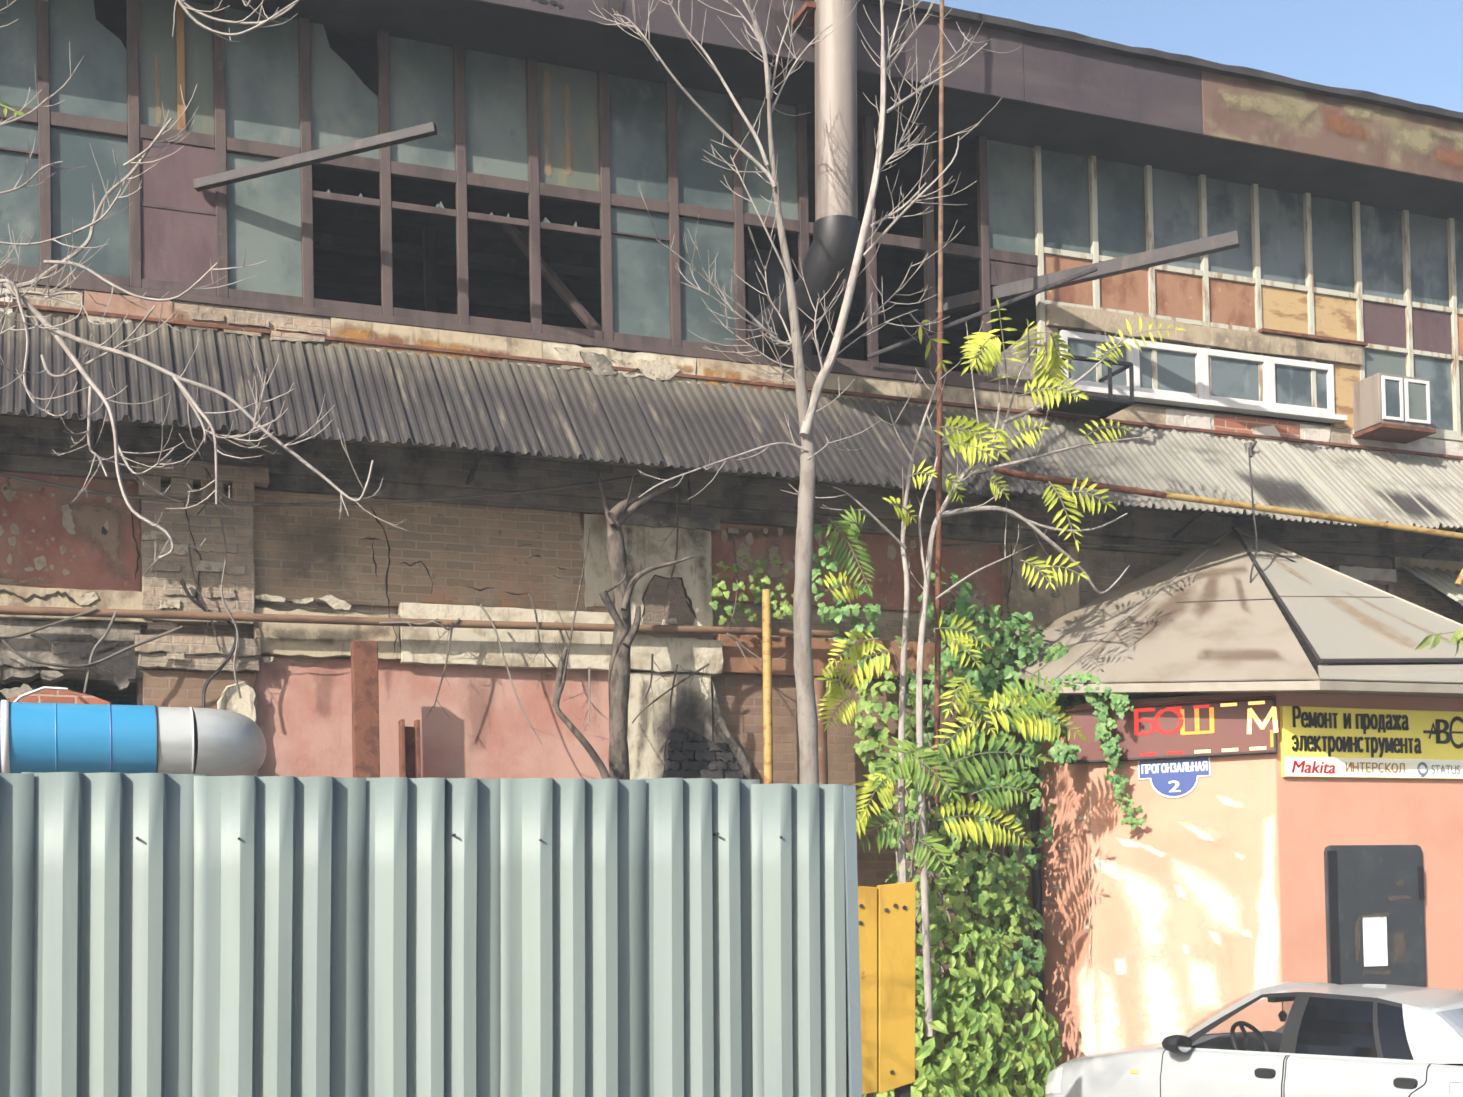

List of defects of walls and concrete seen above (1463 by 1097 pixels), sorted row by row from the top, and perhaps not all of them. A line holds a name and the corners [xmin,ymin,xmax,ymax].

peeling [1222,92,1371,138]
spalling [172,310,325,344]
flaking render [554,347,681,381]
crack [0,589,99,606]
peeling [0,478,245,631]
flaking render [255,594,352,611]
crack [361,506,433,656]
crack [468,544,564,595]
flaking render [627,529,697,626]
spalling [0,627,145,705]
peeling [217,680,259,724]
peeling [1077,817,1278,1057]